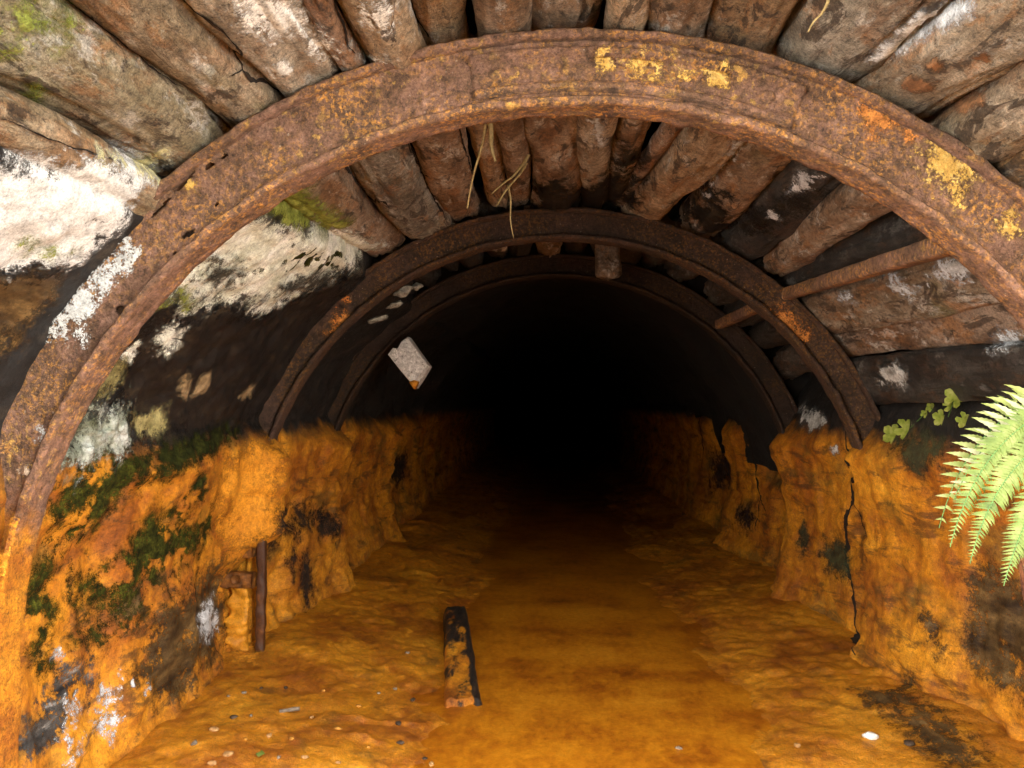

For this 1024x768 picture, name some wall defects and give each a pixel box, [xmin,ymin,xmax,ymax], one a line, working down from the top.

rust [595,45,730,89]
rust [853,100,984,212]
leakage [0,135,171,356]
rust [994,208,1024,241]
rust [323,295,352,334]
rust [768,302,815,344]
rust [0,518,20,588]
crack [844,431,866,655]
leakage [18,545,237,768]